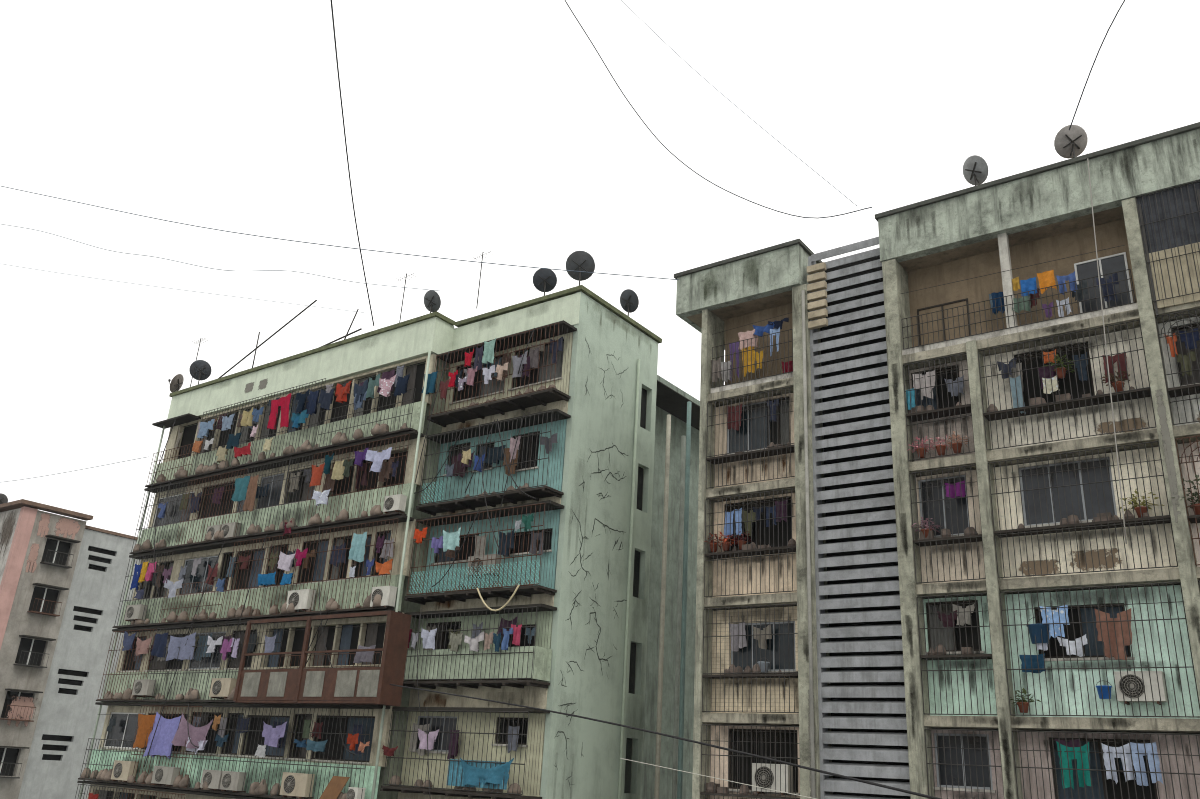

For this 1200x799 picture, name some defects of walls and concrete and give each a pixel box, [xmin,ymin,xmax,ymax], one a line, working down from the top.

crack [585,339,627,407]
crack [554,443,628,786]